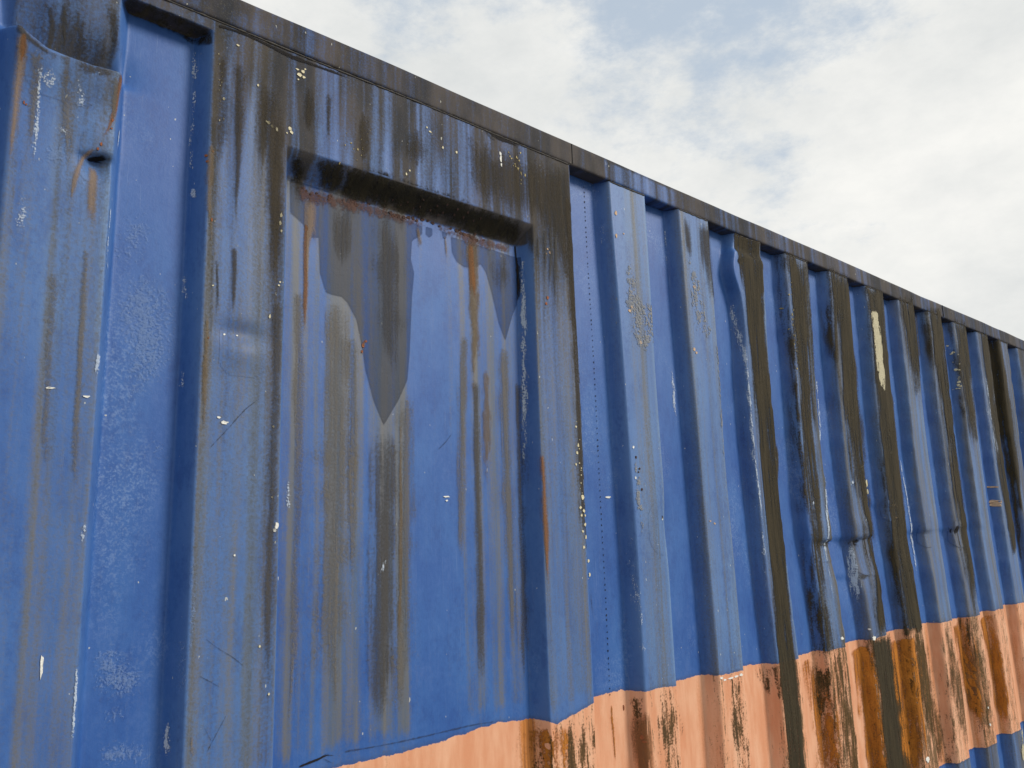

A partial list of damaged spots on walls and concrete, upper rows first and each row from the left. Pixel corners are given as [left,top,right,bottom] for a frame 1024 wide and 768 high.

water stain [319,148,586,527]
water stain [458,340,527,665]
water stain [734,233,806,768]
water stain [780,252,911,768]
peeling [871,311,885,390]
water stain [865,286,922,635]
water stain [982,334,1023,559]
corrosion [632,715,652,768]
corrosion [803,661,841,768]
corrosion [852,647,887,768]
corrosion [892,633,954,768]
corrosion [954,615,1009,721]